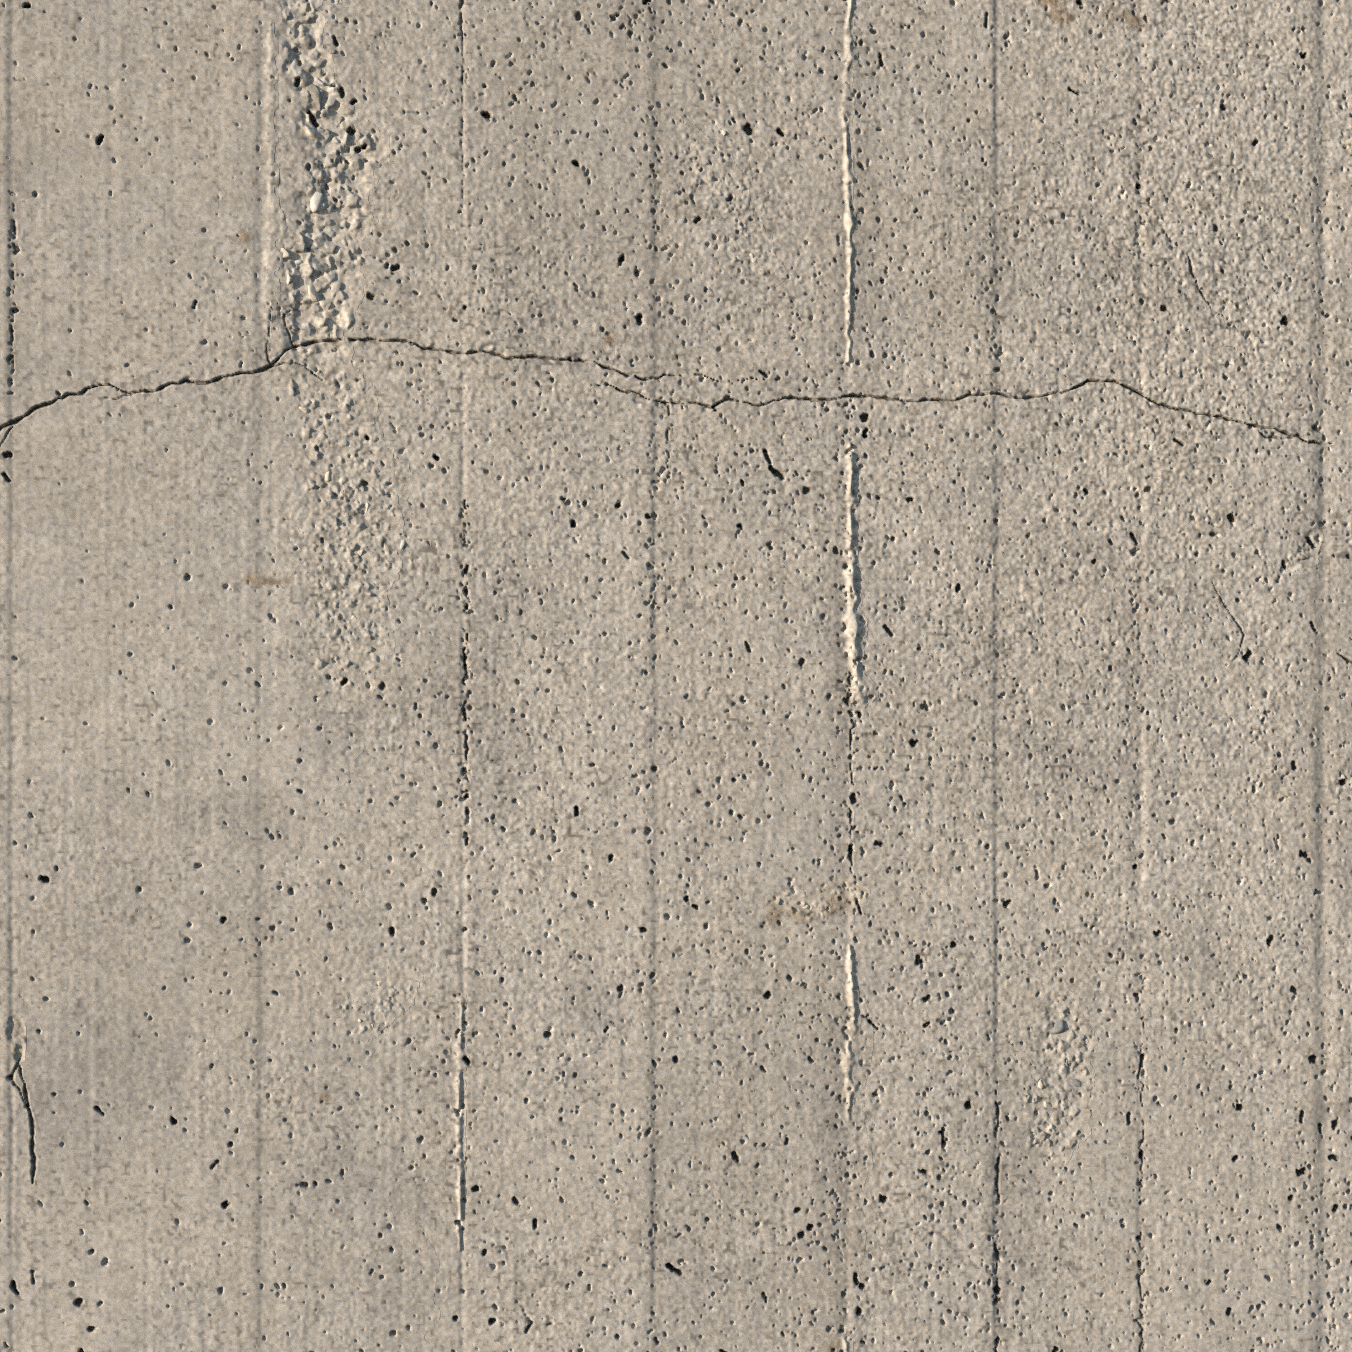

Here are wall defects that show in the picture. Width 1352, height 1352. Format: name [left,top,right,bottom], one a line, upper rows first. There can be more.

crack [0,313,1330,446]